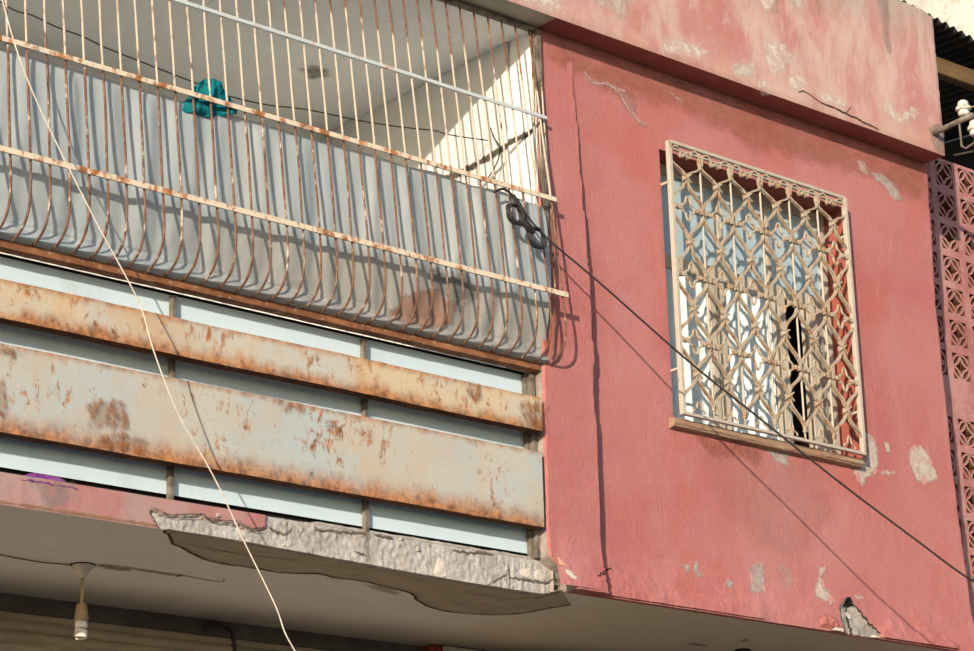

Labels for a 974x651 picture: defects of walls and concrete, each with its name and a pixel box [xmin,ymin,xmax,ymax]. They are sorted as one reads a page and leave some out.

peeling [734,42,804,89]
crack [584,71,647,126]
crack [798,90,878,129]
peeling [857,160,901,200]
corrosion [88,399,144,453]
peeling [853,433,894,484]
peeling [910,446,937,486]
spalling [148,509,577,615]
peeling [749,561,766,592]
spalling [816,565,884,638]